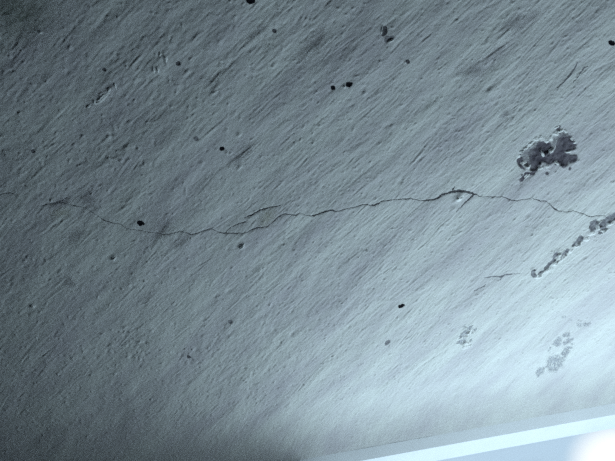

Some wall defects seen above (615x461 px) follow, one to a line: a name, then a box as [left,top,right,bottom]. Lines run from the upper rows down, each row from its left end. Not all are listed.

peeling [517,126,578,182]
crack [43,187,604,235]
peeling [531,213,615,279]